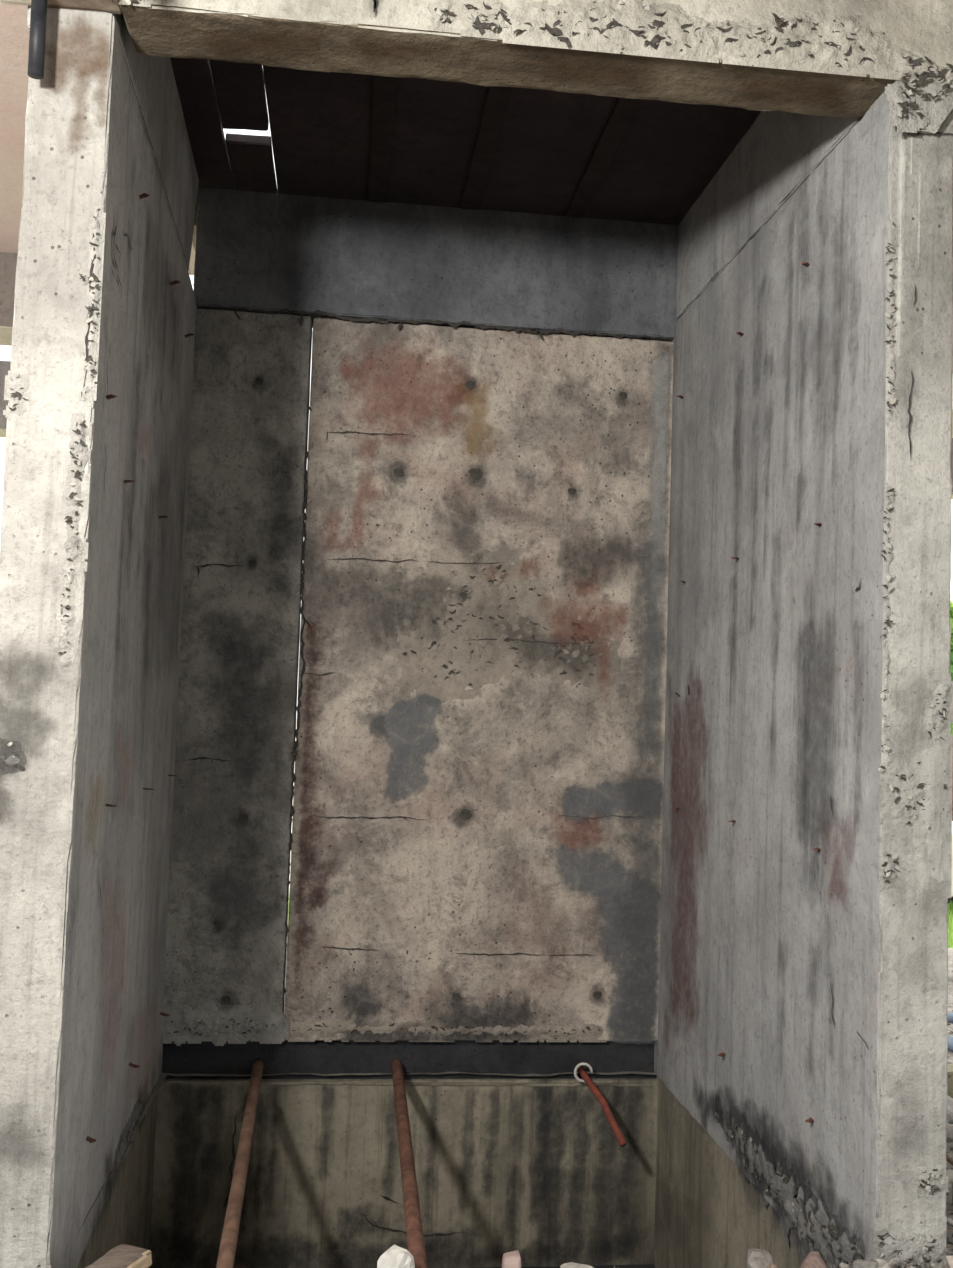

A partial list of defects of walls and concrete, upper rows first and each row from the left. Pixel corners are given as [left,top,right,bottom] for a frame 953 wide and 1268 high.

spalling [427,0,953,134]
crack [907,371,915,461]
leakage [0,702,36,767]
leakage [154,1044,274,1268]
leakage [234,1211,403,1268]
leakage [520,1082,641,1267]
leakage [698,1095,855,1245]